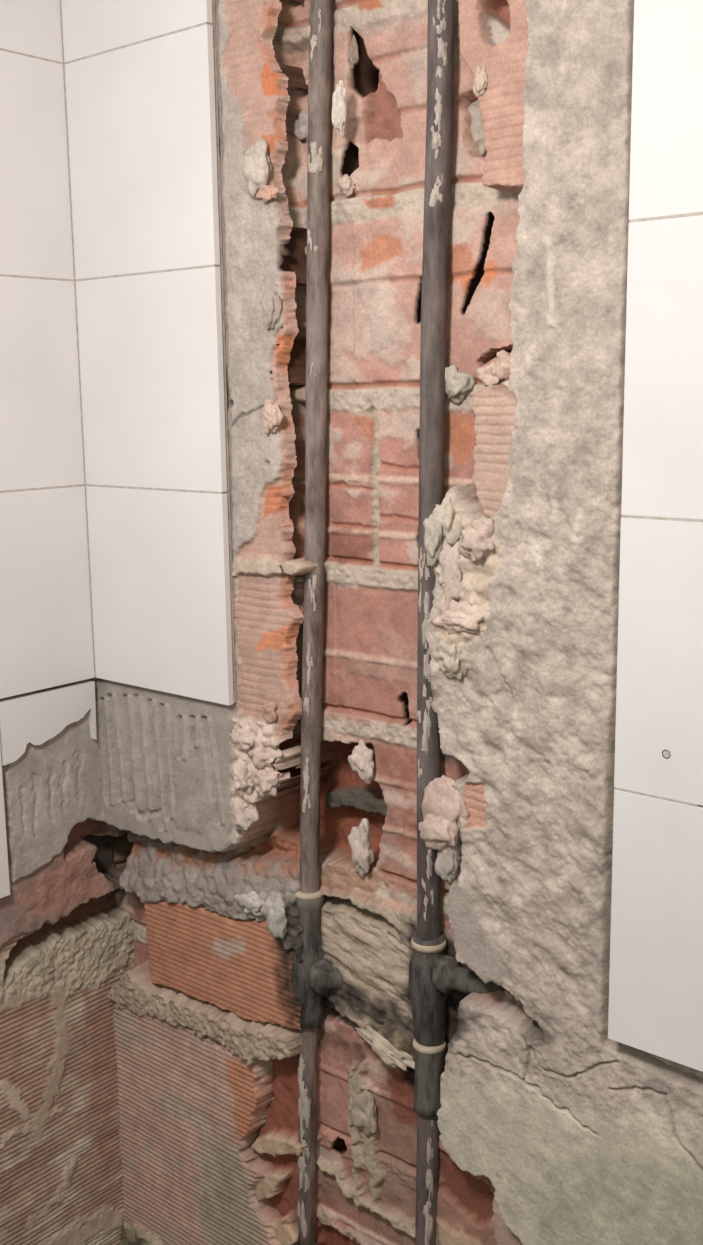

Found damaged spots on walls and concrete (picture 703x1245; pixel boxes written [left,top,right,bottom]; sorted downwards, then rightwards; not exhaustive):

spalling [222,0,309,253]
spalling [332,19,408,197]
spalling [457,0,529,188]
spalling [445,350,517,518]
spalling [234,271,306,803]
spalling [144,890,304,1030]
crack [455,990,703,1175]